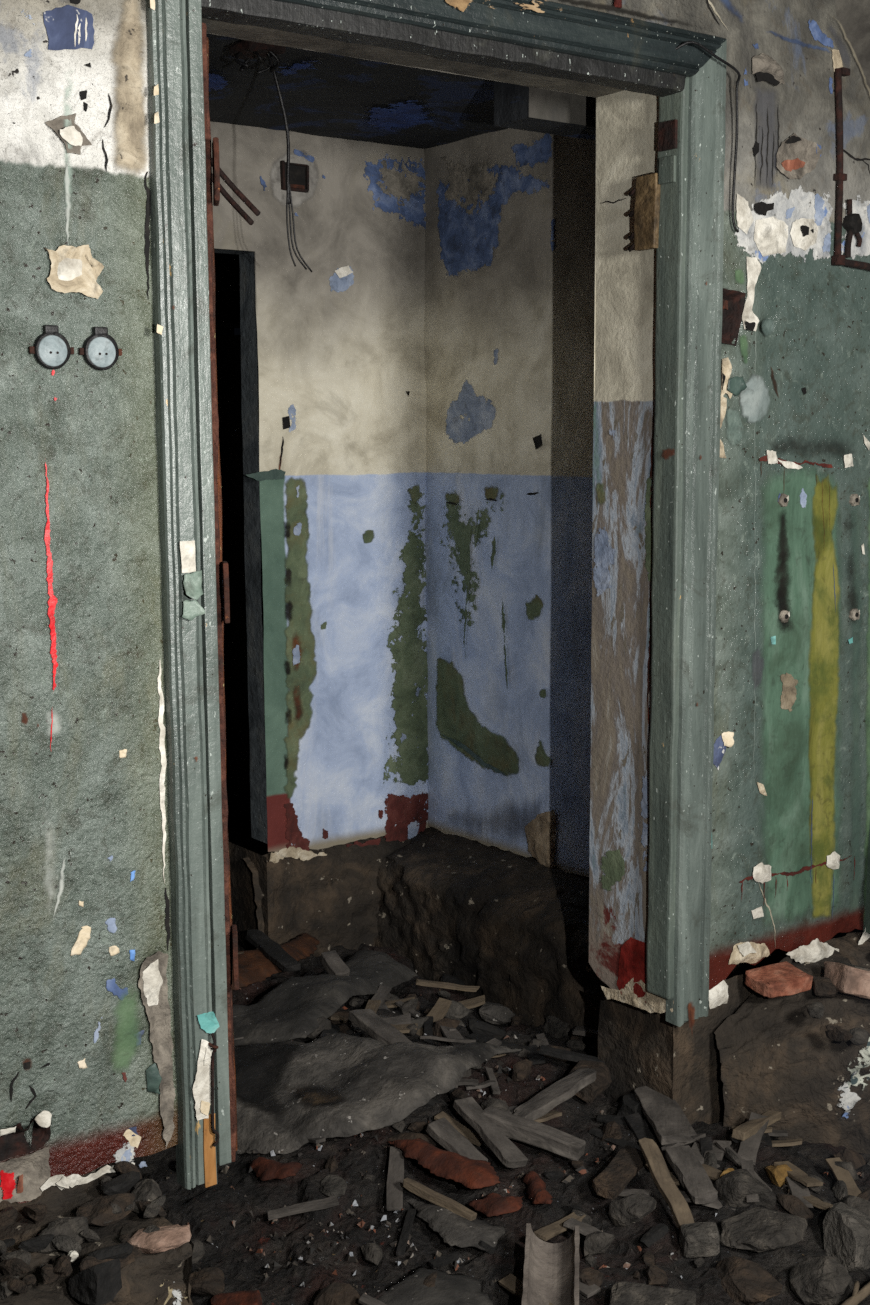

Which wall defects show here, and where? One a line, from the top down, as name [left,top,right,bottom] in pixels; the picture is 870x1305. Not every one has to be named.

peeling [21,0,95,68]
peeling [445,0,472,12]
peeling [515,0,547,13]
peeling [363,134,552,276]
flaking render [47,245,104,299]
peeling [720,133,870,458]
peeling [446,380,496,444]
peeling [246,469,328,863]
peeling [345,485,519,847]
peeling [599,849,625,891]
flaking render [787,938,839,964]
peeling [837,1037,870,1119]